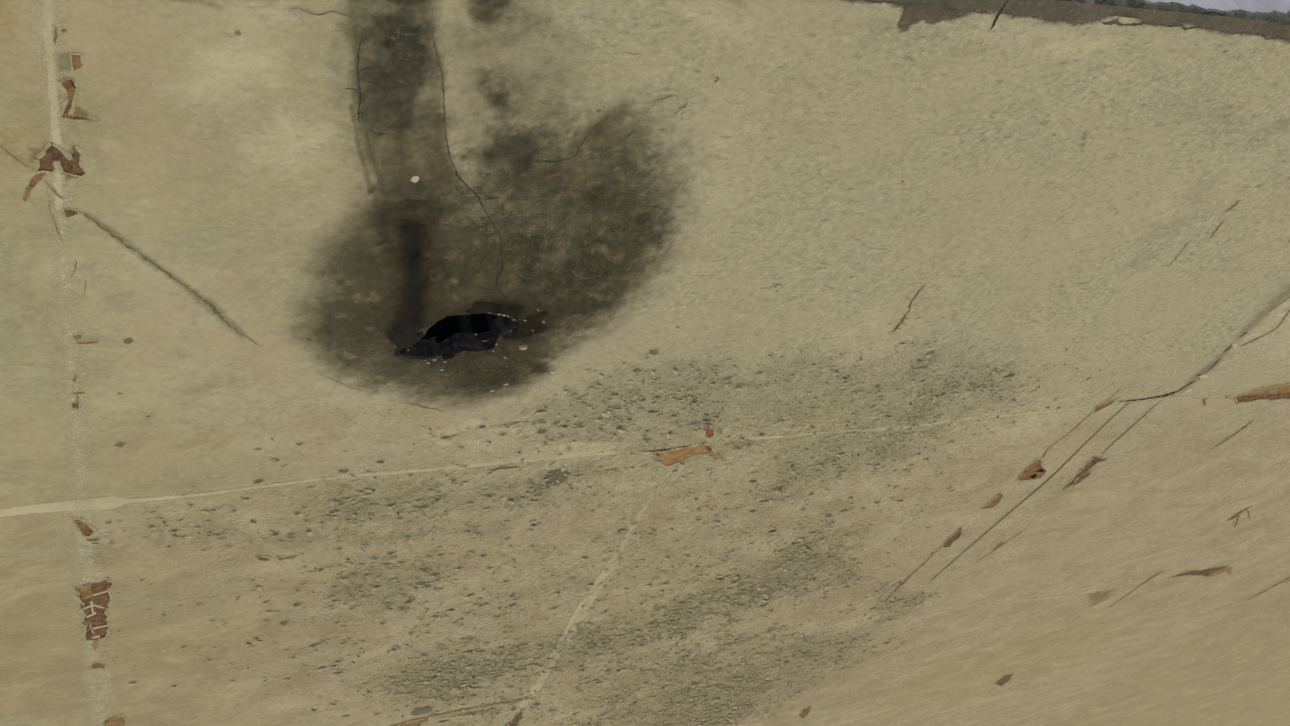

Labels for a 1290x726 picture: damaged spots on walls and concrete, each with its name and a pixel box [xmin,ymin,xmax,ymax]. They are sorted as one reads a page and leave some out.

leakage [843,0,1290,43]
spalling [1058,0,1290,40]
rust [58,53,100,121]
rust [23,143,85,201]
leakage [313,0,658,398]
crack [0,145,259,346]
rust [1226,383,1290,404]
rust [645,404,727,466]
crack [1216,420,1254,447]
spalling [87,305,1113,726]
crack [879,388,1178,608]
rust [75,577,112,669]